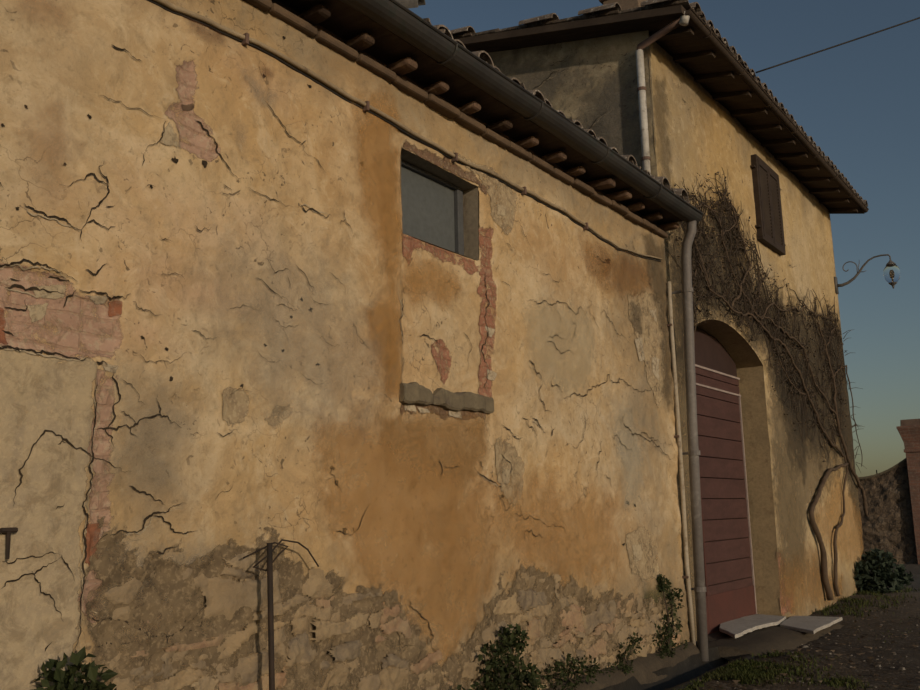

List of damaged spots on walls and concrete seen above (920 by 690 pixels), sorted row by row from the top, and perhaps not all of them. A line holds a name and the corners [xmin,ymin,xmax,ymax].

crack [23,163,115,239]
crack [102,95,166,186]
spalling [161,60,221,168]
crack [197,121,240,195]
crack [257,192,353,233]
crack [0,258,156,316]
spalling [401,141,518,397]
crack [534,273,622,354]
spalling [0,263,123,623]
crack [0,330,238,650]
leakage [323,419,486,660]
crack [439,360,671,541]